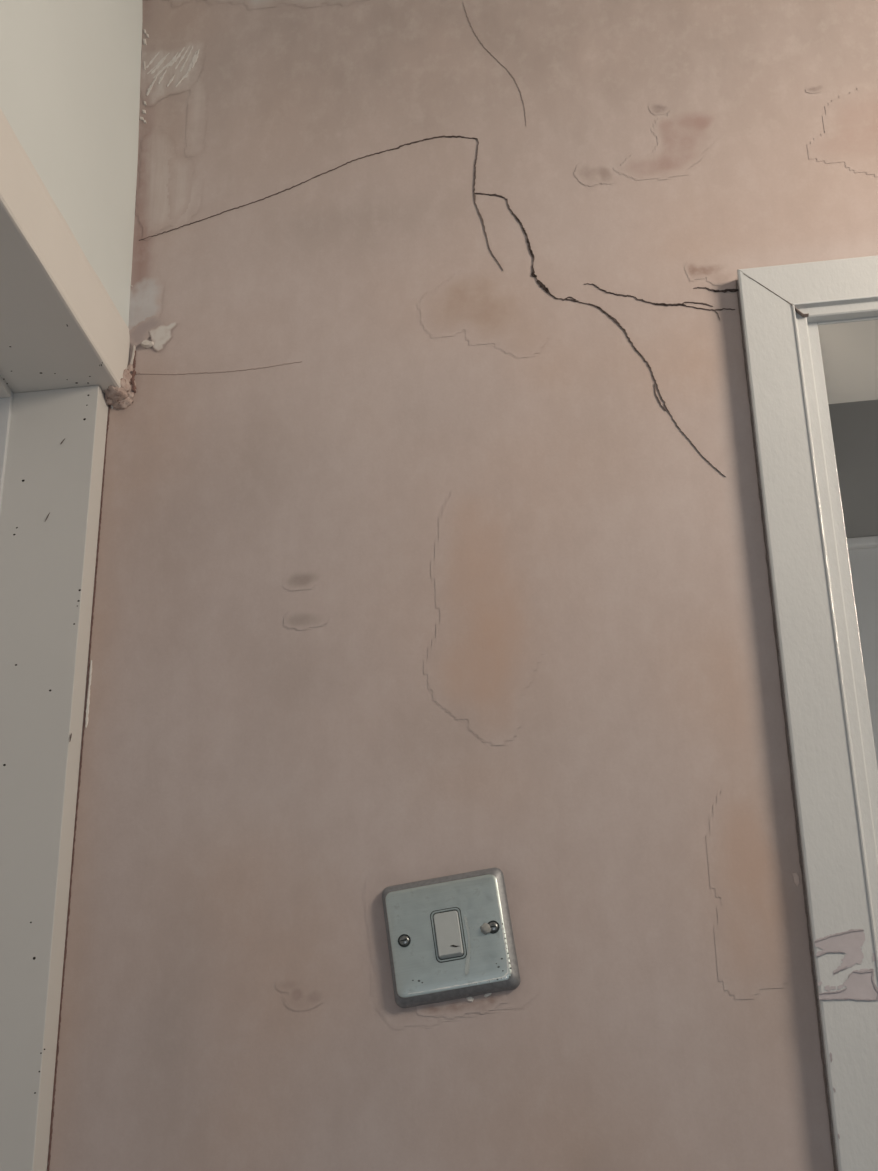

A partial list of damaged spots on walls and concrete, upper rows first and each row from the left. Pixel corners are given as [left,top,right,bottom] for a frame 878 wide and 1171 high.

crack [136,135,836,1171]